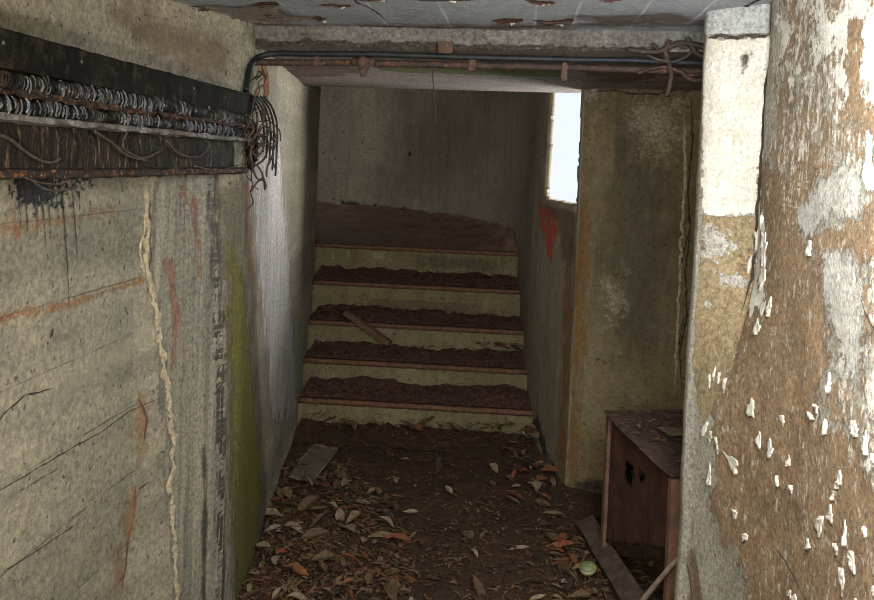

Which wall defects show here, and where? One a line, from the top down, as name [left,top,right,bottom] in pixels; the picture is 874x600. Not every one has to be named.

crack [587,89,694,388]
crack [741,71,768,312]
flaking render [692,0,874,600]
crack [859,294,874,338]